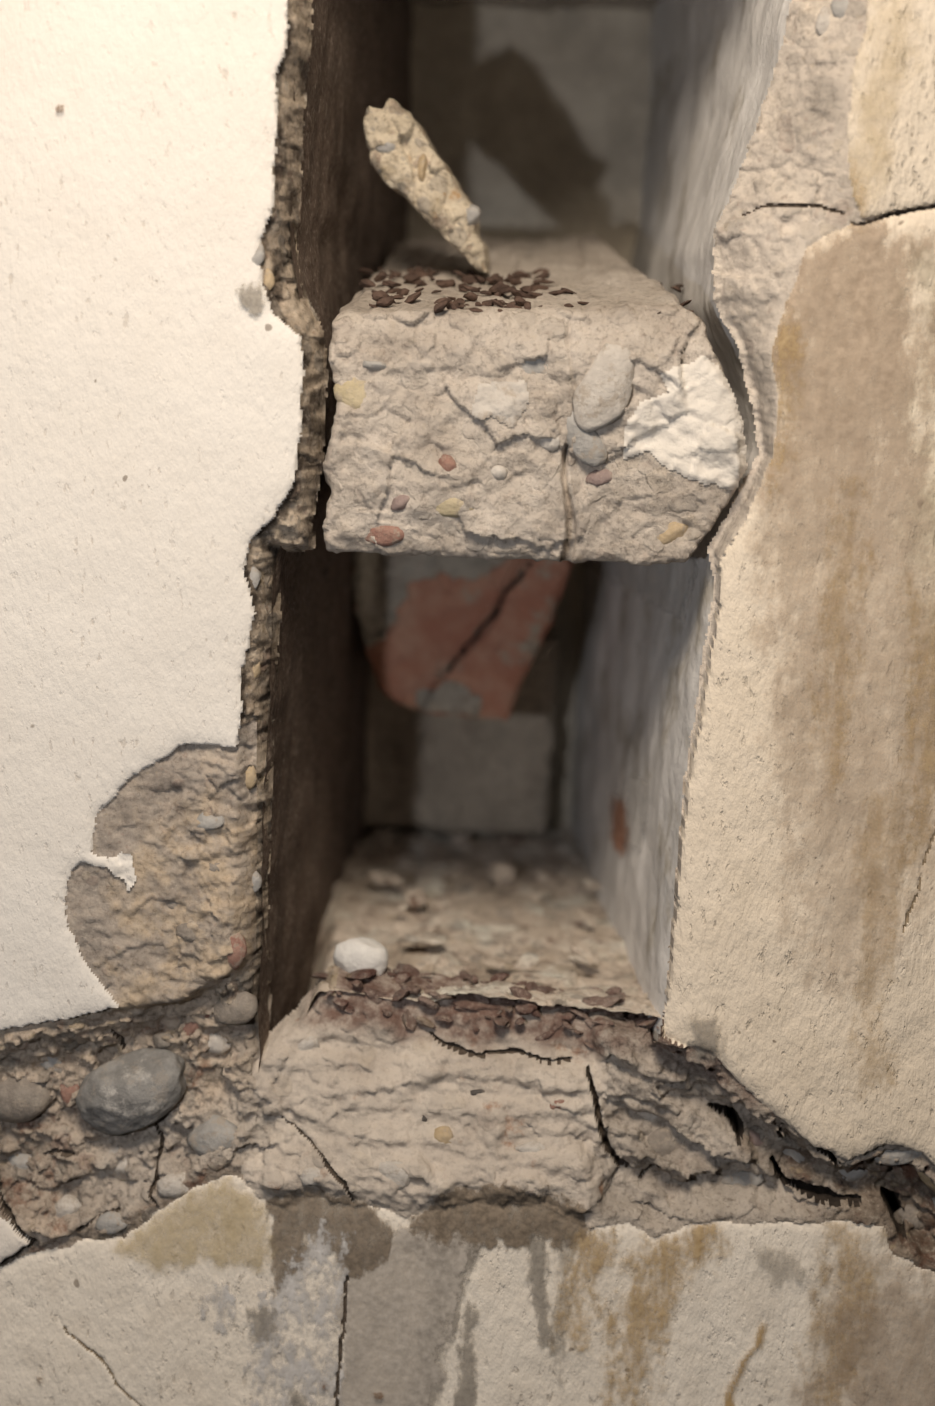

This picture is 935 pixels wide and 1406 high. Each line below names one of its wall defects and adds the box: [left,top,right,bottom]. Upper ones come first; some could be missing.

crack [742,203,935,226]
peeling [65,0,329,1022]
spalling [668,0,884,964]
flaking render [610,775,647,855]
crack [111,1029,126,1050]
crack [0,1180,37,1265]
crack [45,1148,75,1158]
crack [76,1122,165,1233]
spalling [0,964,935,1272]
crack [709,1103,907,1239]
damp [120,1183,588,1406]